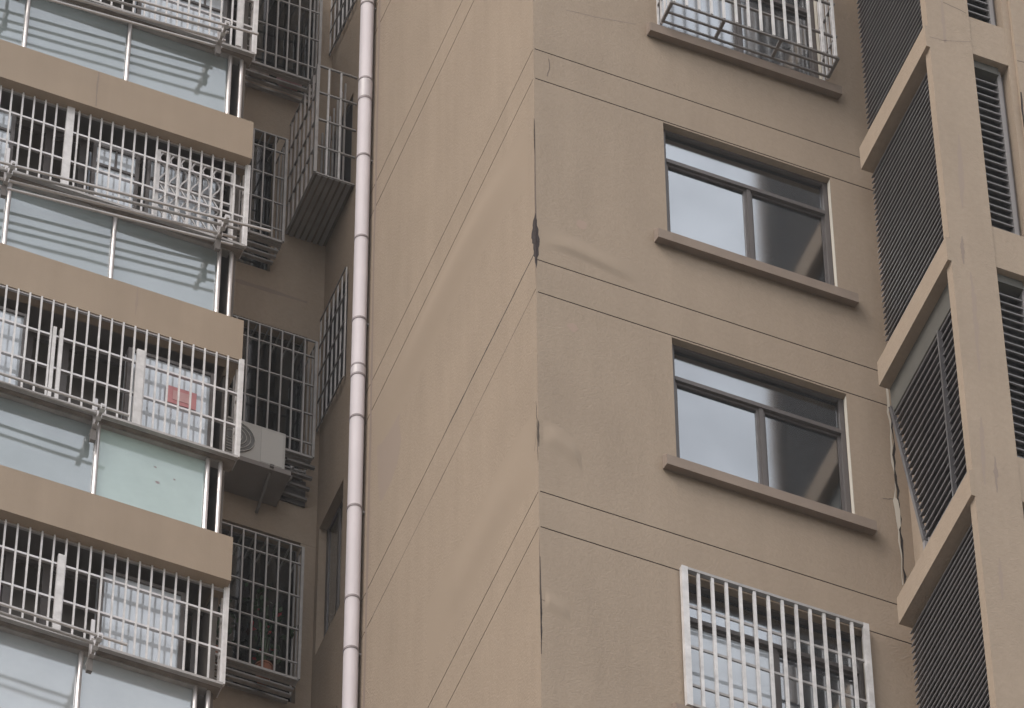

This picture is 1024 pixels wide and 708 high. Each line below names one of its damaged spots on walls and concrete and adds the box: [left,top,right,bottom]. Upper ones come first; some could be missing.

crack [531,118,539,218]
crack [883,407,907,584]